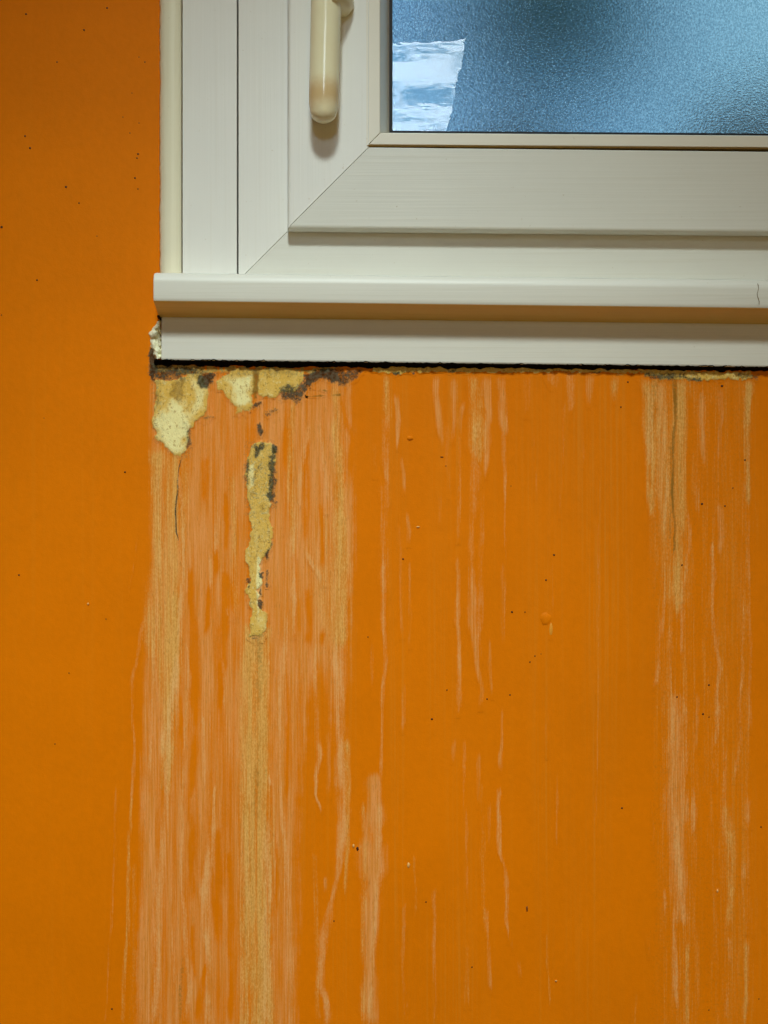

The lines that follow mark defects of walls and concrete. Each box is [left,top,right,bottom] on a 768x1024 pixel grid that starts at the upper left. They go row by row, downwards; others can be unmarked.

crack [174,456,182,546]
peeling [150,367,305,460]
peeling [242,439,279,645]
water stain [103,344,768,1024]